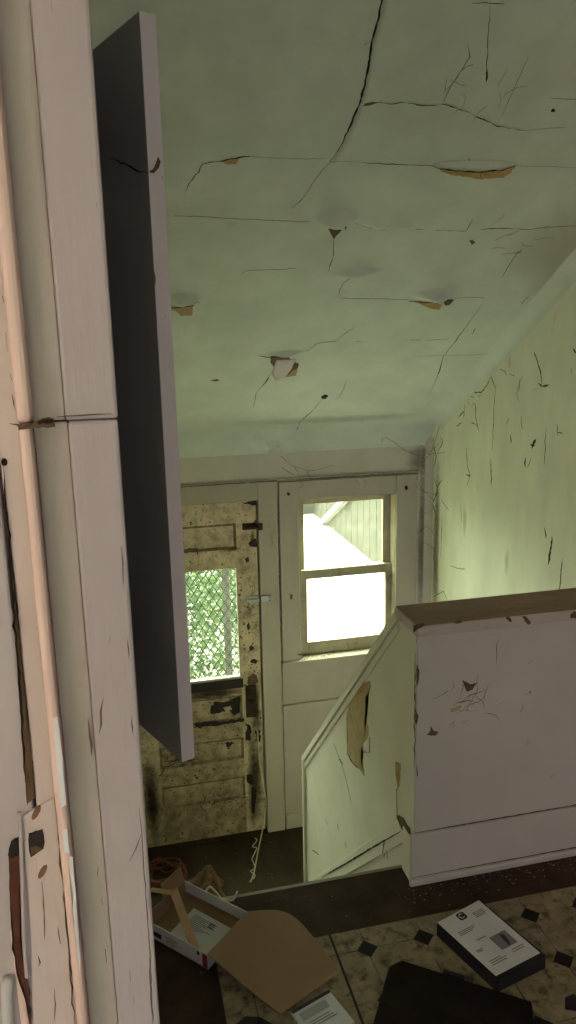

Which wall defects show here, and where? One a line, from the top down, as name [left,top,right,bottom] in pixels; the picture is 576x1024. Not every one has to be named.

crack [185,0,565,222]
flaking render [221,156,250,165]
flaking render [433,157,517,180]
crack [328,220,571,300]
flaking render [171,305,194,316]
flaking render [410,299,453,310]
flaking render [261,356,299,381]
crack [421,297,495,569]
flaking render [346,681,371,776]
spalling [396,815,411,834]